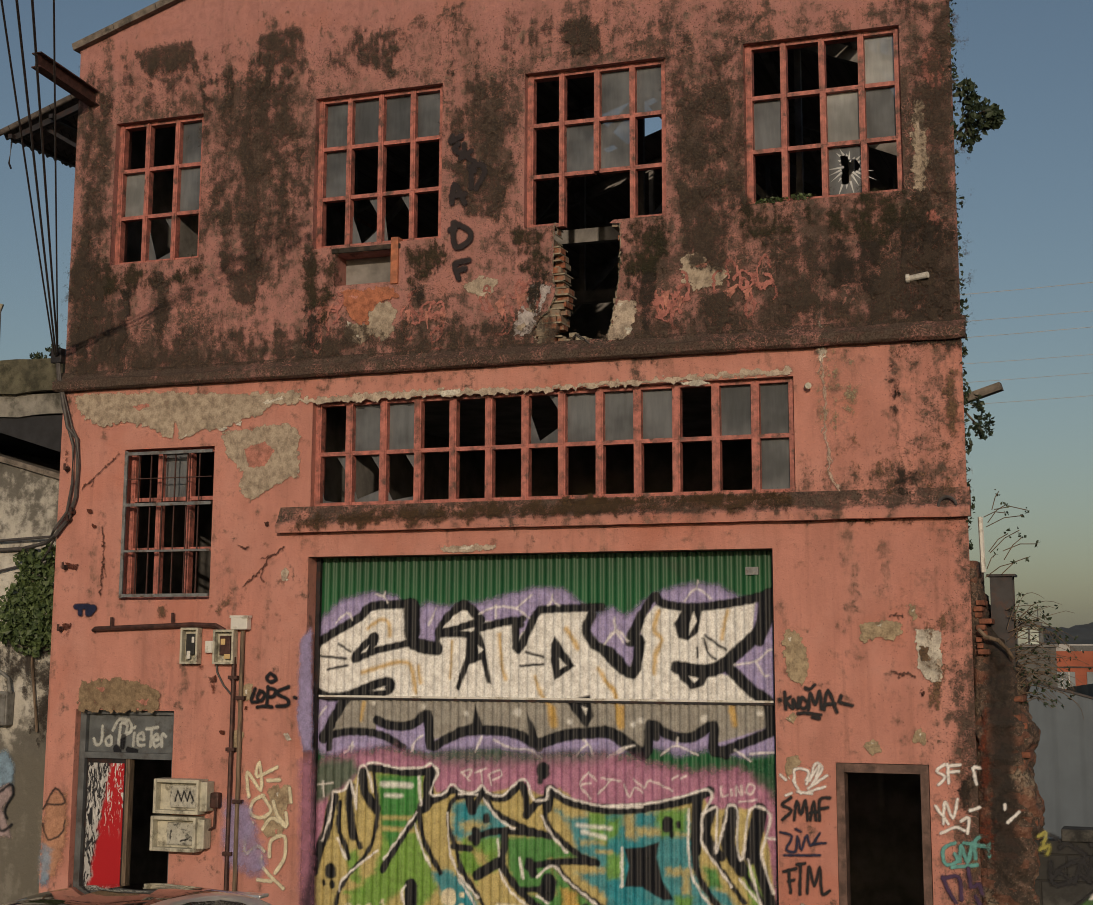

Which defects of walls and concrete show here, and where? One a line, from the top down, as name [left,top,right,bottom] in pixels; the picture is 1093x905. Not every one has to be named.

water stain [500,8,600,60]
water stain [65,13,572,376]
water stain [627,0,969,339]
peeling [341,286,399,345]
flaking render [513,223,574,344]
flaking render [606,223,637,340]
peeling [651,253,779,328]
water stain [888,338,962,413]
peeling [74,366,792,501]
peeling [77,677,160,714]
peeling [781,629,809,685]
flaking render [859,604,943,682]